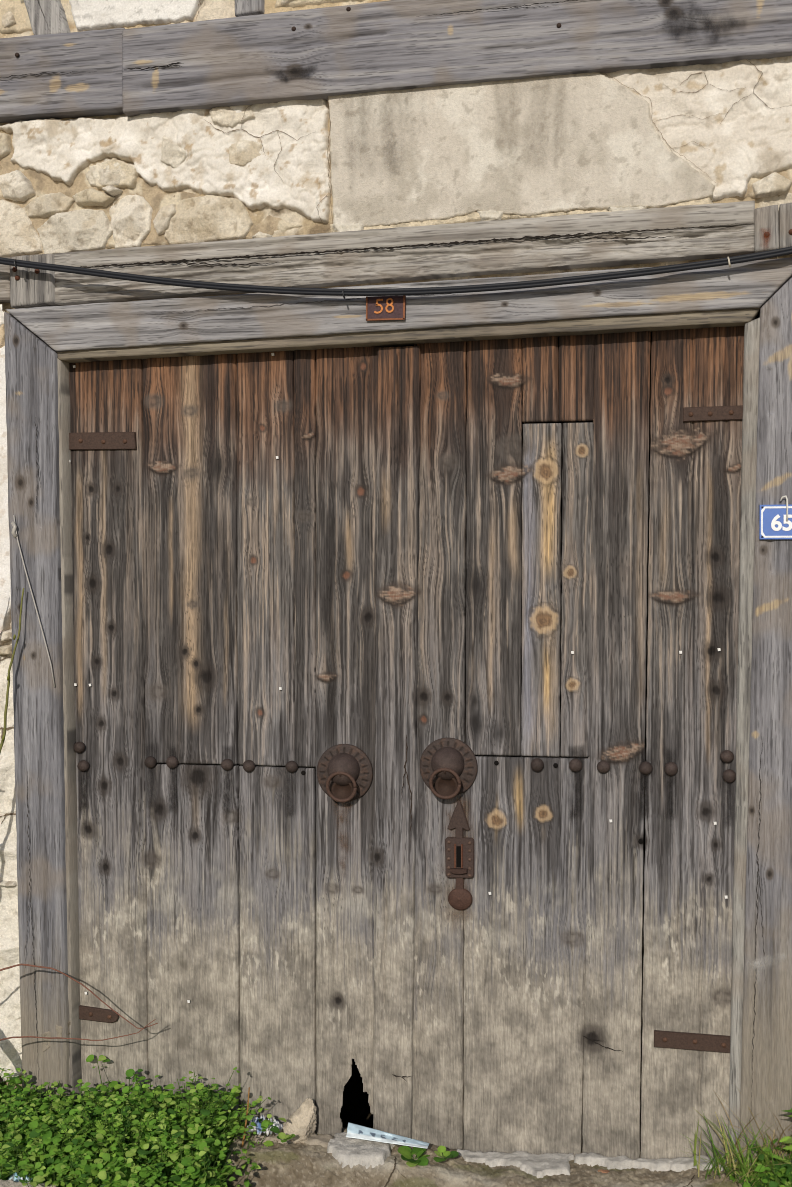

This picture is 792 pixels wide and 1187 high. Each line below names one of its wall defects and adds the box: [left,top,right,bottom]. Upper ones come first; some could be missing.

spalling [0,629,22,1082]